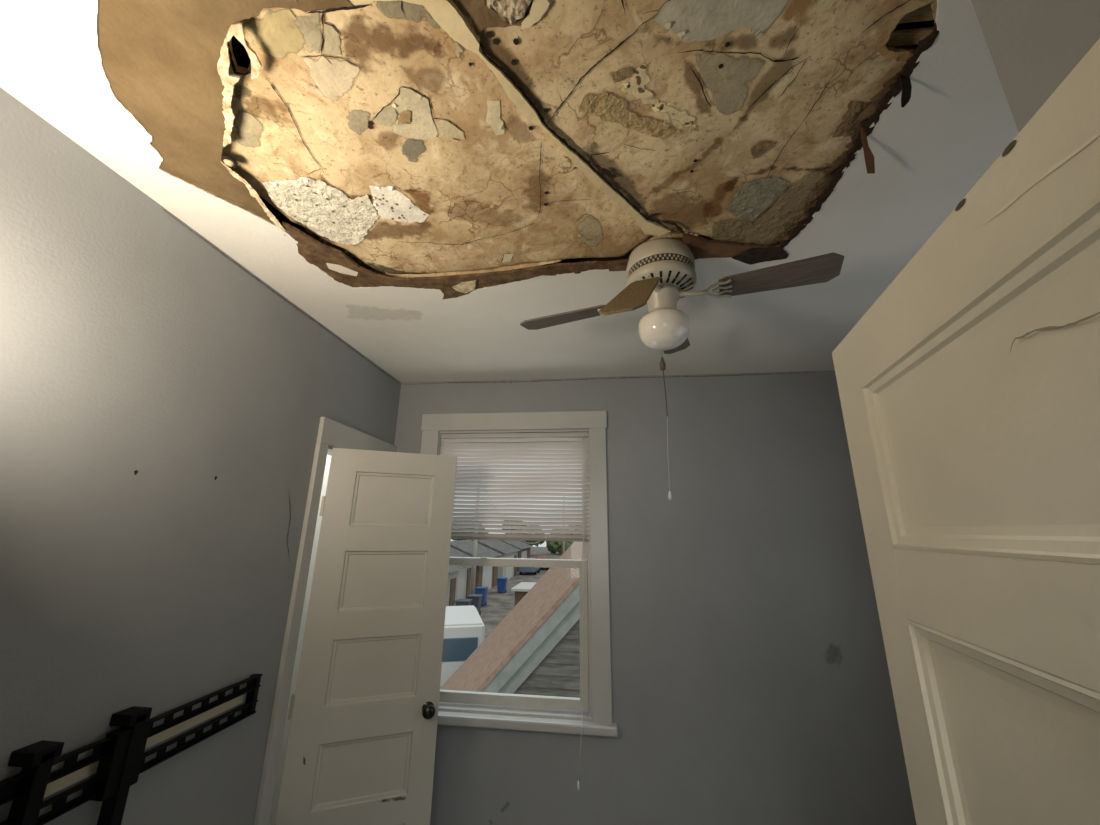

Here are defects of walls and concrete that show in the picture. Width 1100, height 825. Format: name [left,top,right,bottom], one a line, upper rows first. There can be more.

crack [263,74,324,174]
crack [306,4,372,67]
crack [373,87,460,132]
crack [400,0,684,262]
flaking render [222,0,937,300]
crack [677,30,807,119]
crack [752,54,841,215]
crack [861,0,910,34]
crack [1010,312,1100,352]